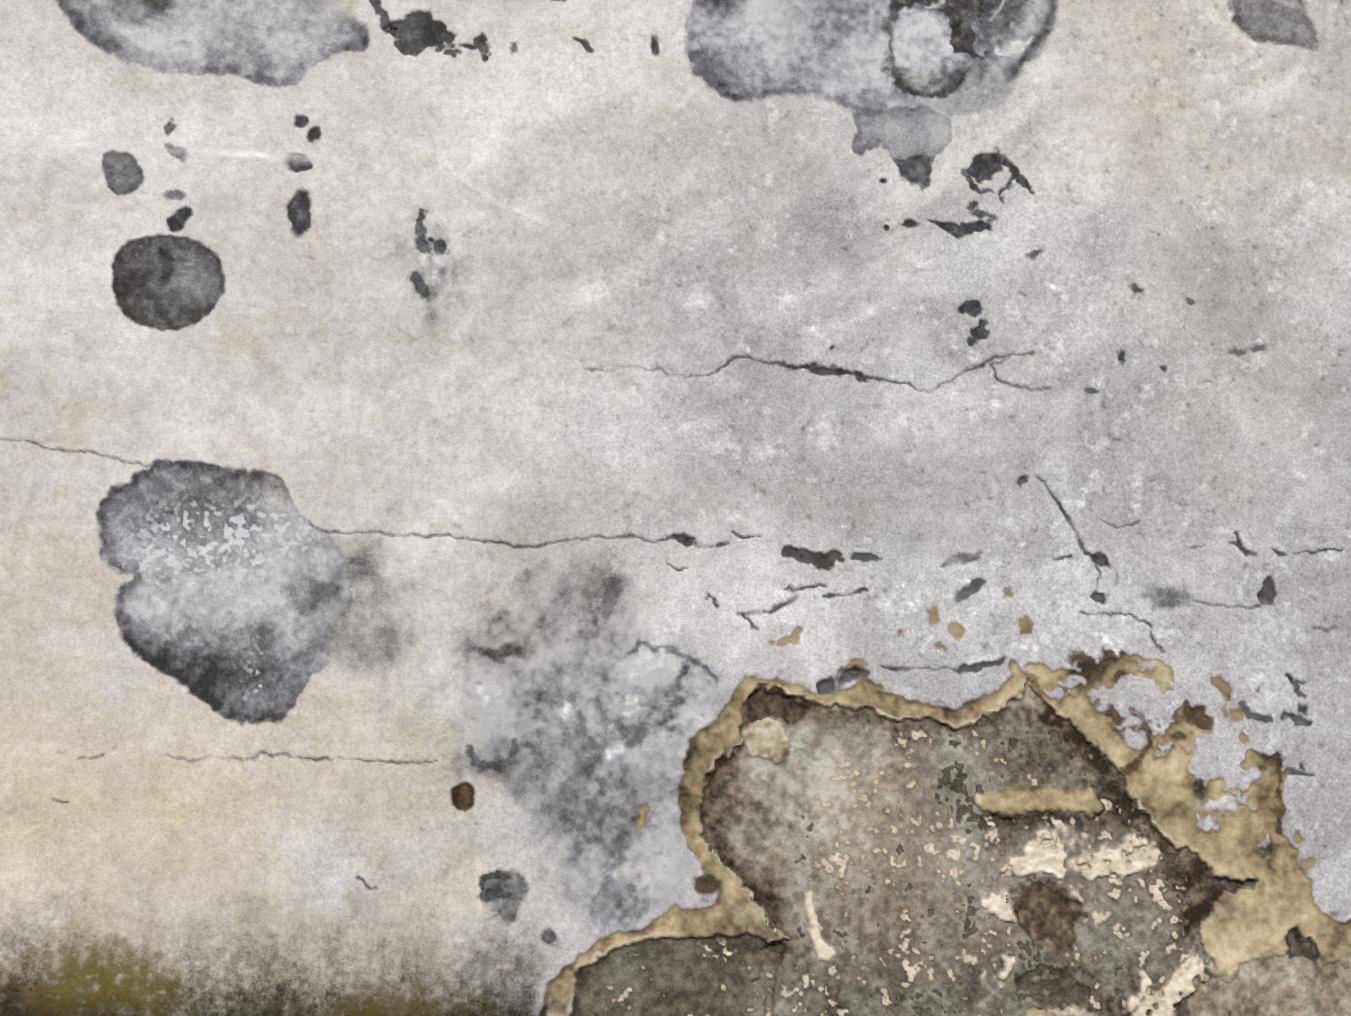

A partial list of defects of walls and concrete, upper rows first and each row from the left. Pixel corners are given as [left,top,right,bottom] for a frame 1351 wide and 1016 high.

spalling [540,649,1351,1016]